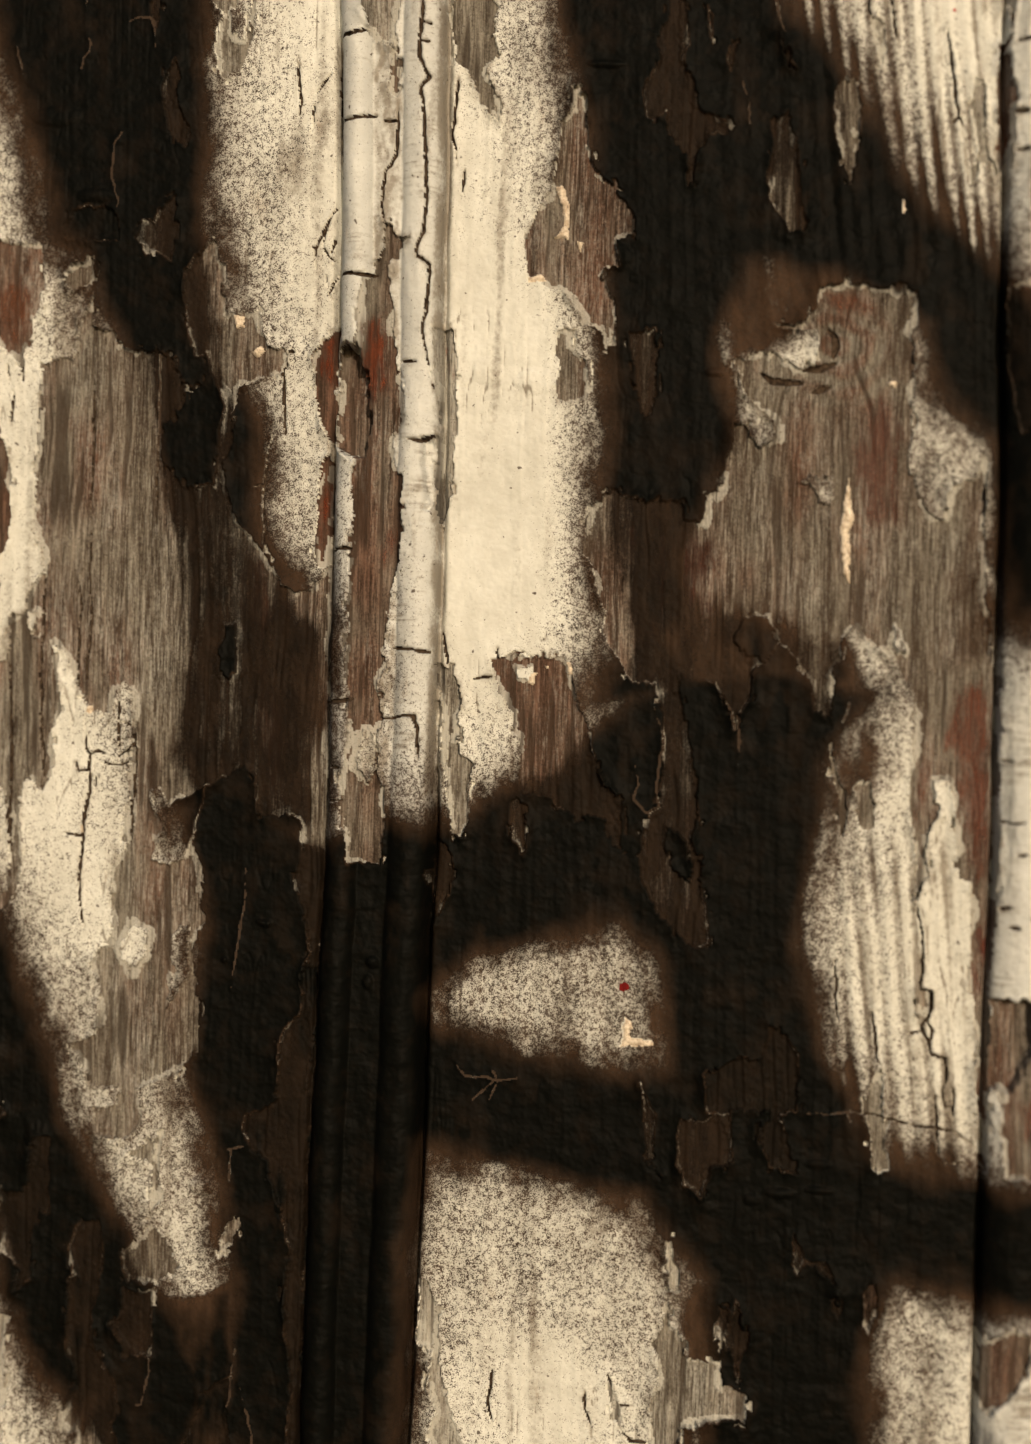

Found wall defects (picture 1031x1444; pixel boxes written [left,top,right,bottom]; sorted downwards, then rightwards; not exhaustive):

crack [297,0,466,387]
peeling [525,75,635,403]
peeling [967,0,1025,187]
crack [408,434,436,443]
crack [5,383,138,923]
peeling [0,210,416,1306]
peeling [484,650,595,801]
peeling [684,277,1031,1188]
crack [807,899,963,1165]
peeling [414,1277,464,1444]
peeling [644,1233,753,1444]
peeling [970,1323,1031,1425]